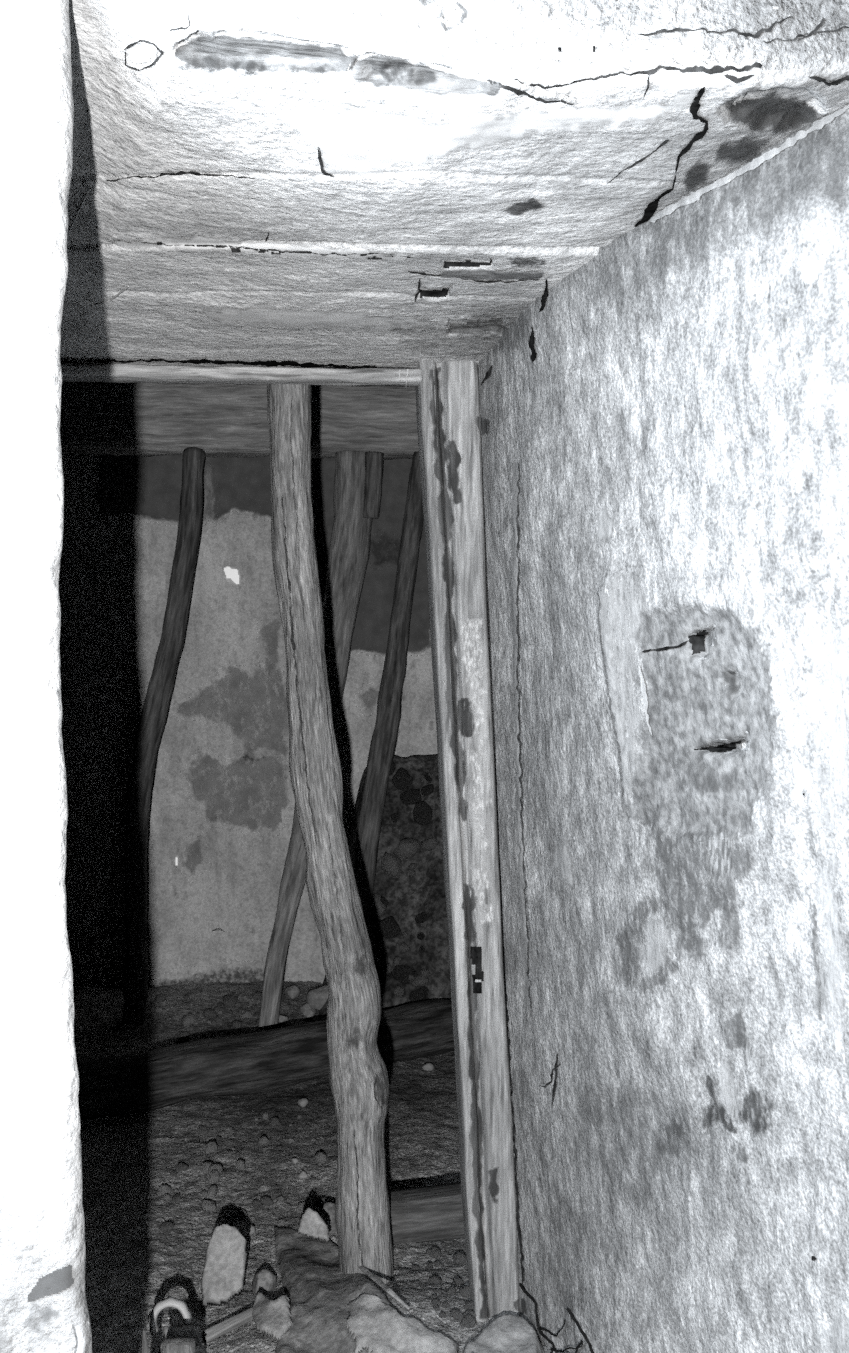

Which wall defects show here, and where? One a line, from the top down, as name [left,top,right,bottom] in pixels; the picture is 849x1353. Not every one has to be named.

crack [486,7,849,227]
leakage [178,621,287,829]
leakage [616,827,753,991]
leakage [726,1013,746,1048]